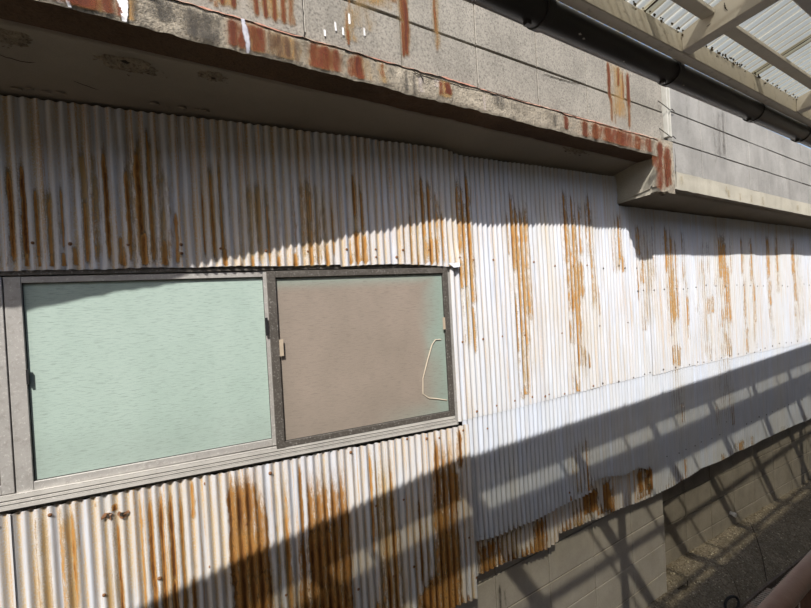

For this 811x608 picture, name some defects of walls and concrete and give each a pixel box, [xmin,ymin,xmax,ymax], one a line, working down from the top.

rust [227,19,297,59]
rust [345,0,409,56]
rust [582,63,672,189]
rust [5,132,181,266]
rust [506,198,533,399]
rust [562,193,600,392]
rust [635,226,689,334]
rust [104,518,125,608]
rust [139,481,197,608]
rust [226,467,353,608]
rust [368,454,404,608]
rust [418,430,470,608]